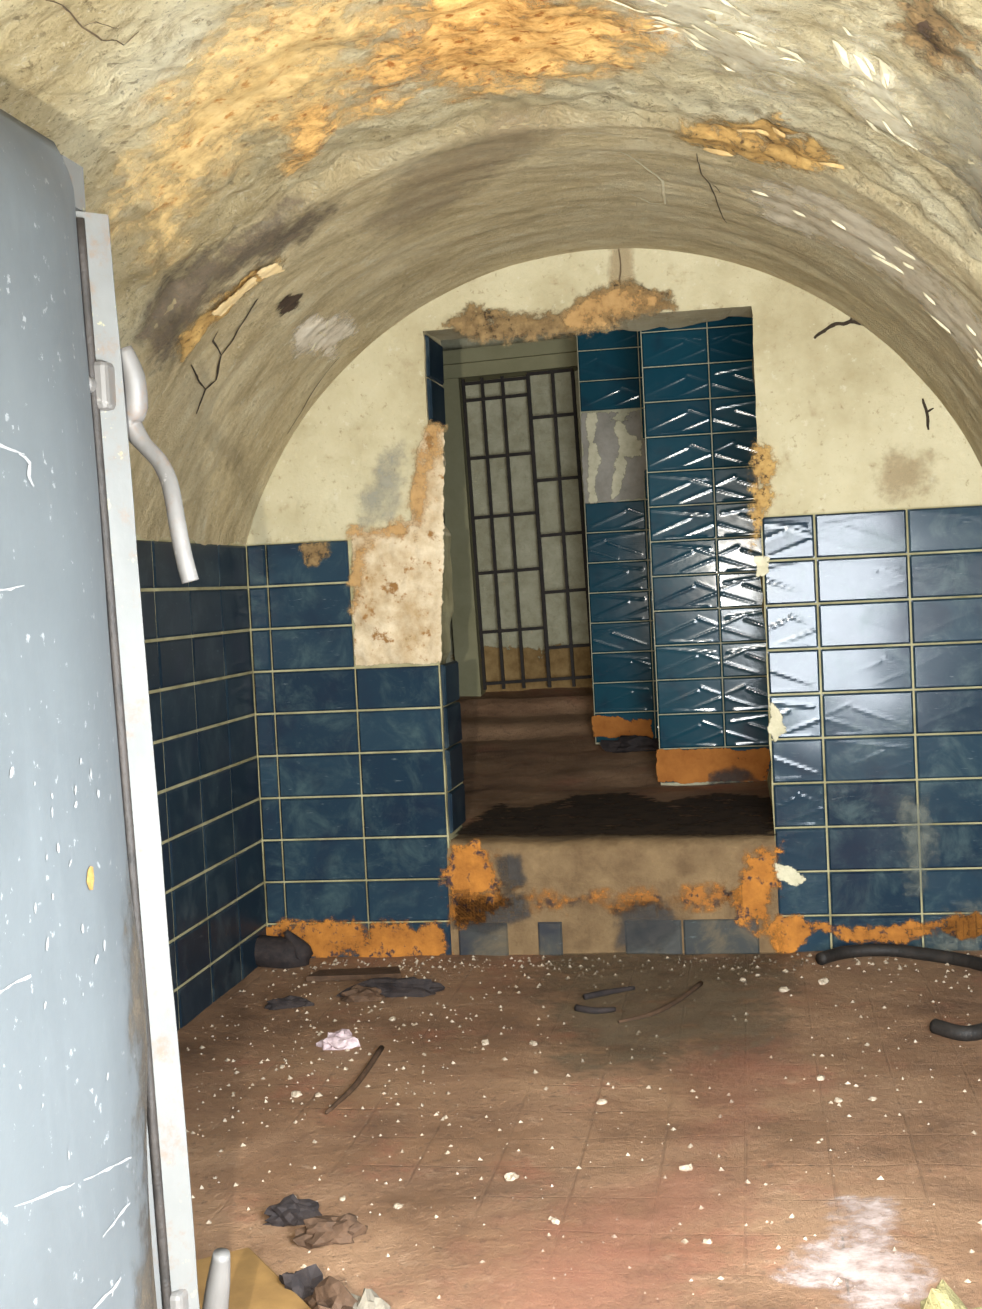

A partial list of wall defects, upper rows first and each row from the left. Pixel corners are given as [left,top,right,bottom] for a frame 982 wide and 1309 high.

crack [45,0,138,46]
spalling [878,0,980,81]
spalling [676,113,844,173]
crack [696,153,727,223]
spalling [442,279,678,345]
crack [814,318,863,339]
spalling [346,423,445,666]
spalling [748,443,777,577]